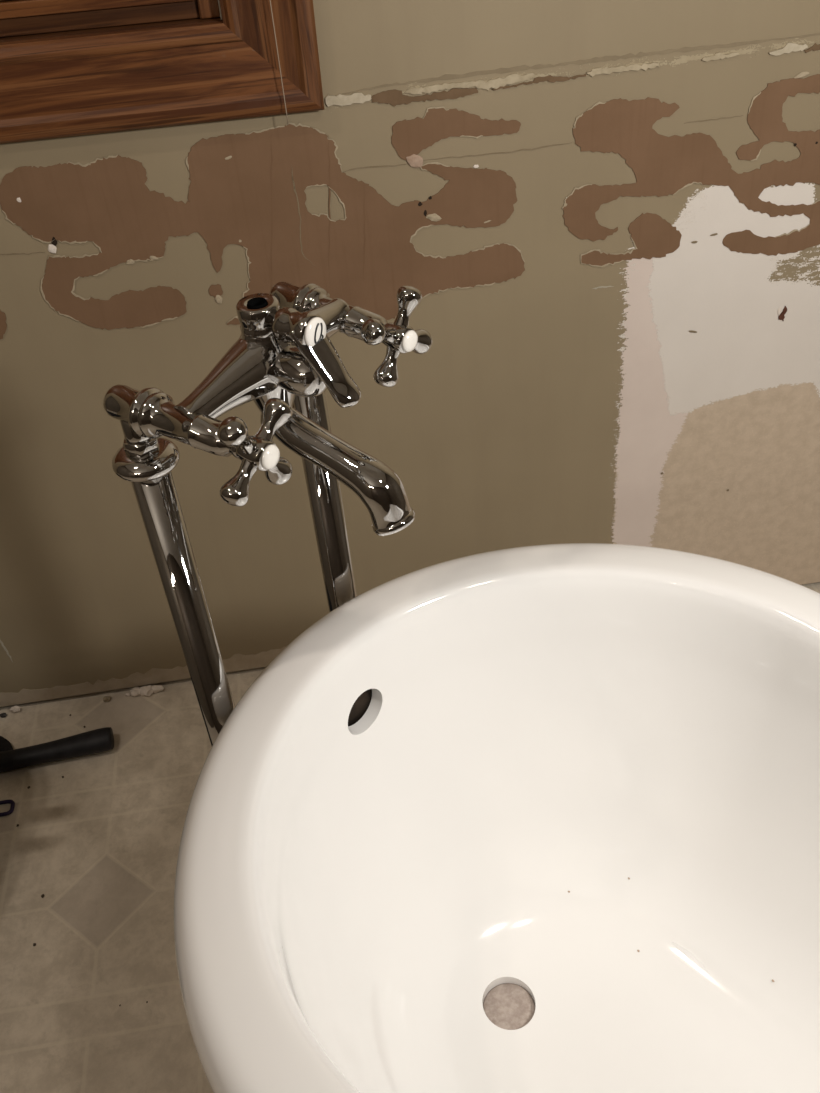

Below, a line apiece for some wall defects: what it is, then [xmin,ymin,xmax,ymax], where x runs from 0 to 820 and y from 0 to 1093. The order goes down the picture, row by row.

peeling [0,106,525,330]
peeling [562,72,820,267]
peeling [648,382,820,585]